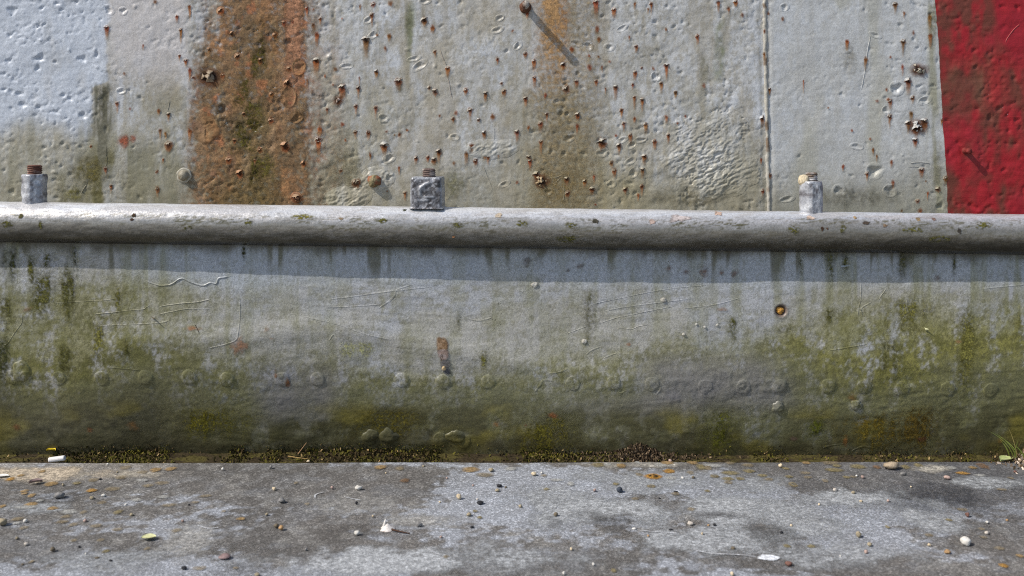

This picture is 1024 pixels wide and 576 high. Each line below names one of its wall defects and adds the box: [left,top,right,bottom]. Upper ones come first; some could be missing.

corrosion [187,0,321,206]
corrosion [533,0,593,209]